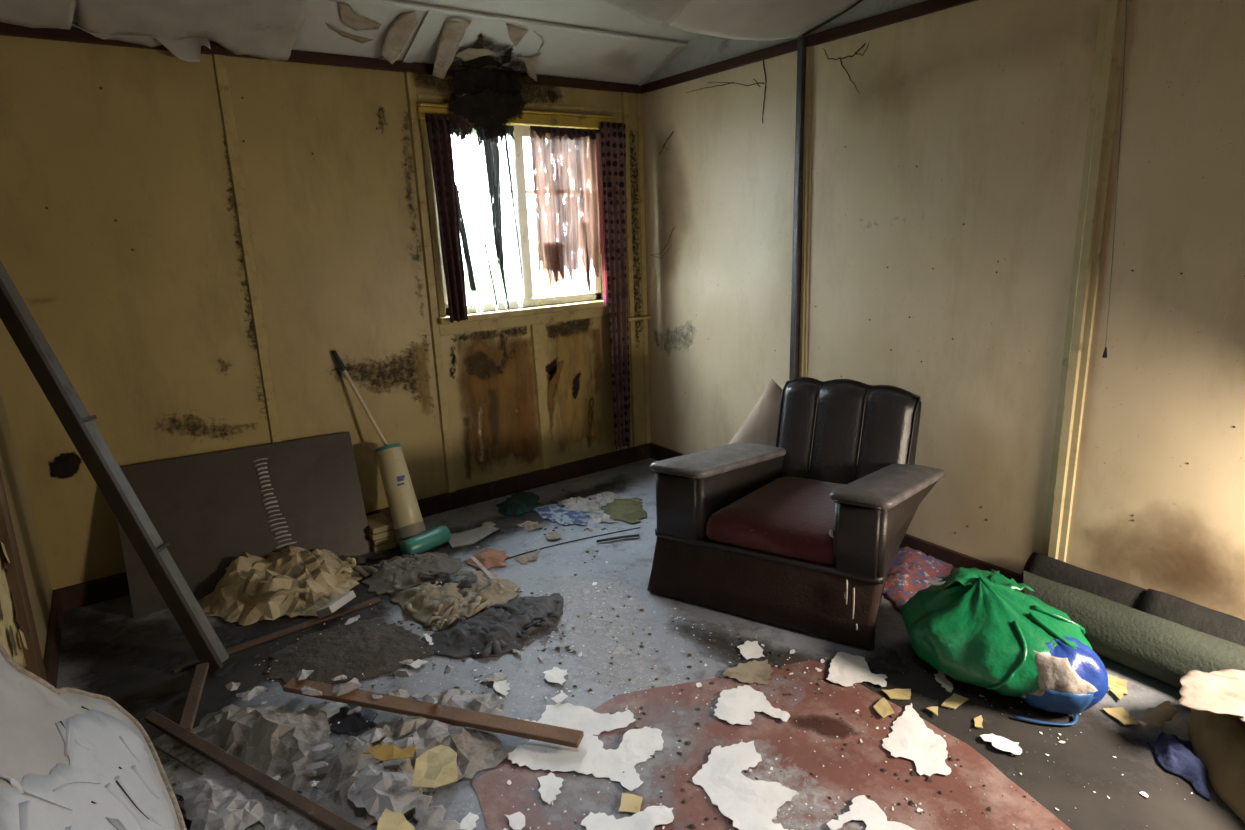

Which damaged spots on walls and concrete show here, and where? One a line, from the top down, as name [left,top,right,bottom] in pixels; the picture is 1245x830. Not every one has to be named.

crack [686,60,767,123]
crack [802,0,869,92]
water stain [223,136,257,350]
spalling [48,452,82,479]
water stain [158,416,249,438]
water stain [335,335,428,410]
water stain [450,318,601,475]
peeling [0,534,187,830]